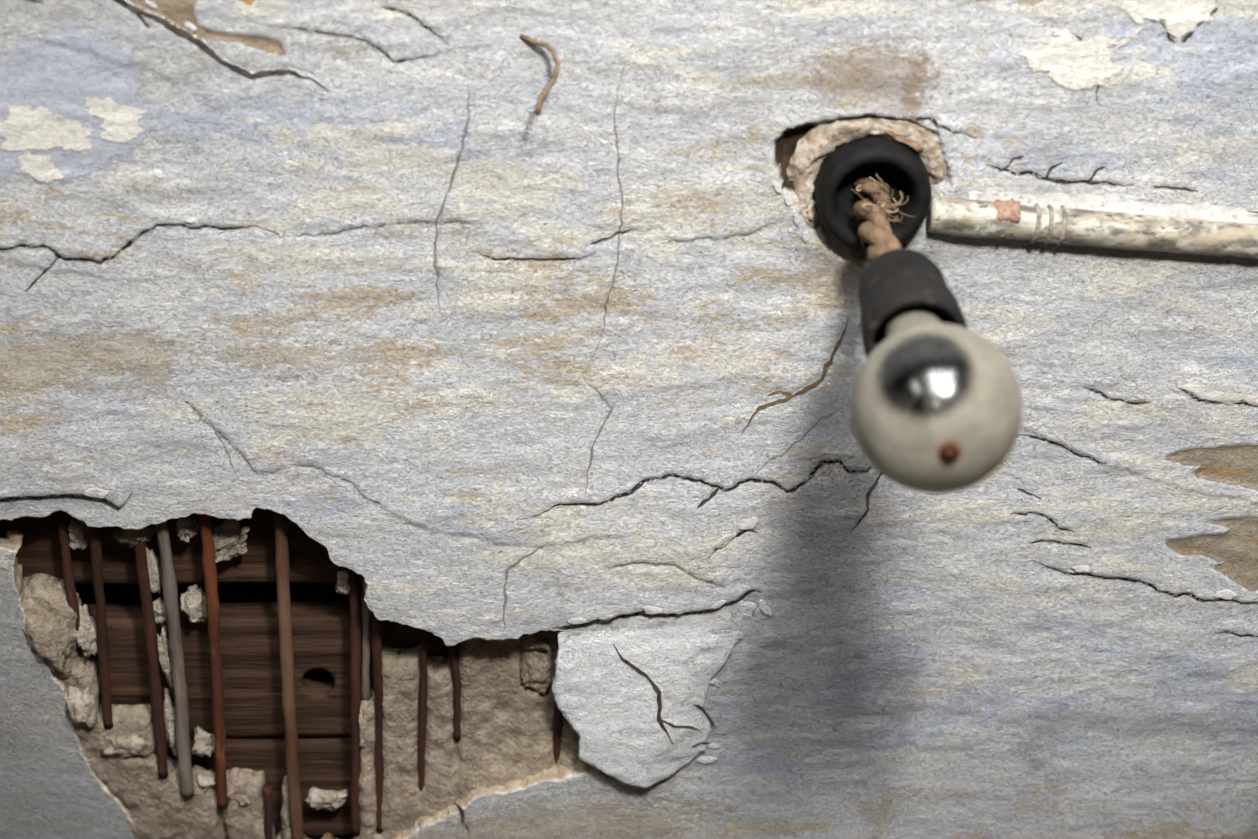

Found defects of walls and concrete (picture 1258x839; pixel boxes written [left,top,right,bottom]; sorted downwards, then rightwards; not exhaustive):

peeling [130,0,286,55]
crack [284,6,448,63]
peeling [1019,0,1218,90]
peeling [0,24,221,190]
flaking render [772,114,947,243]
crack [846,115,1199,192]
crack [0,62,882,629]
crack [1020,434,1102,463]
peeling [1164,444,1258,491]
crack [1011,488,1255,603]
peeling [1165,516,1258,592]
flaking render [0,507,749,839]